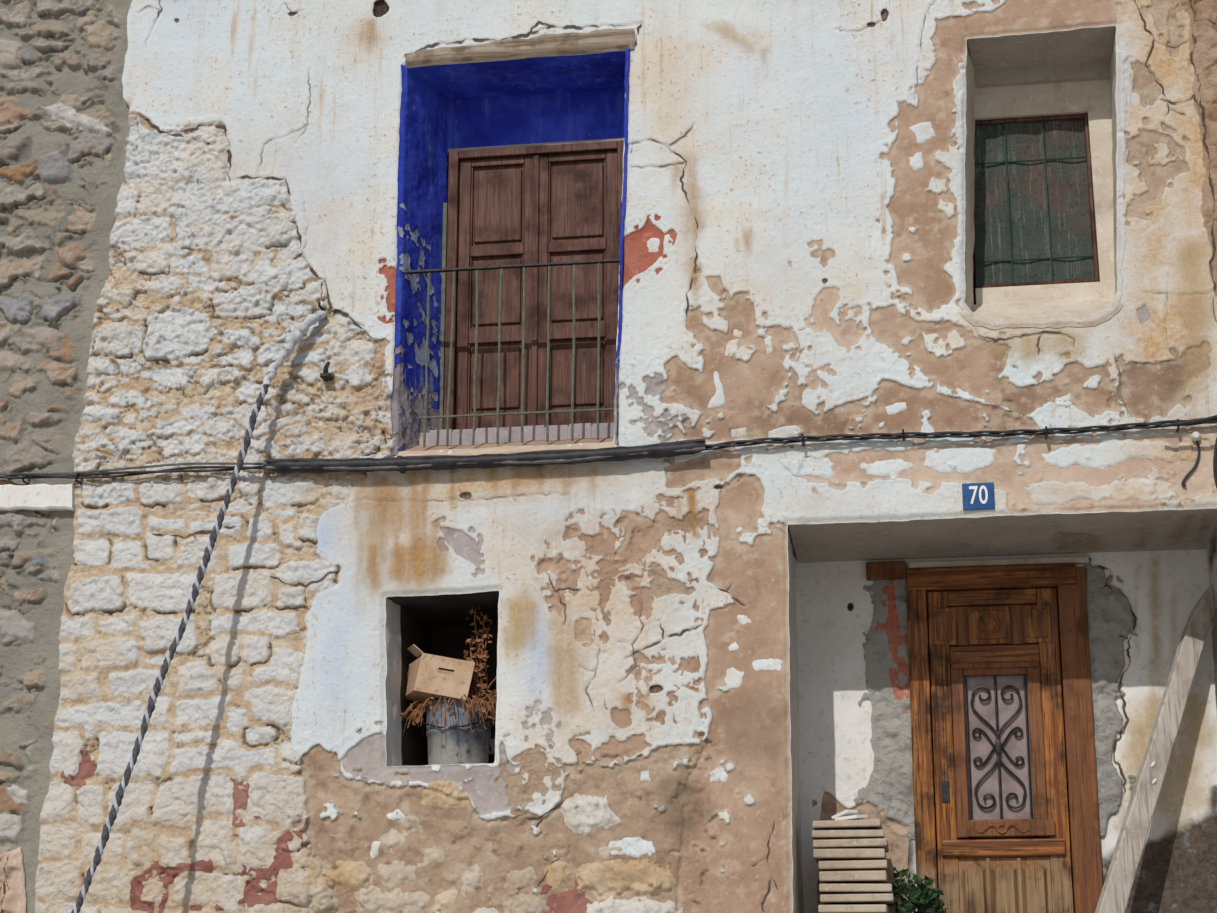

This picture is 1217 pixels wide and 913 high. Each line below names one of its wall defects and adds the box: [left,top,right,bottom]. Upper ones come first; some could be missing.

crack [138,70,379,340]
crack [629,127,698,317]
peeling [618,0,1217,515]
crack [914,0,936,98]
crack [1134,0,1217,333]
peeling [34,104,792,913]
spalling [812,579,915,913]
leakage [1102,854,1113,885]
spalling [1084,558,1138,838]
leakage [1125,786,1217,913]
leakage [1159,703,1204,811]